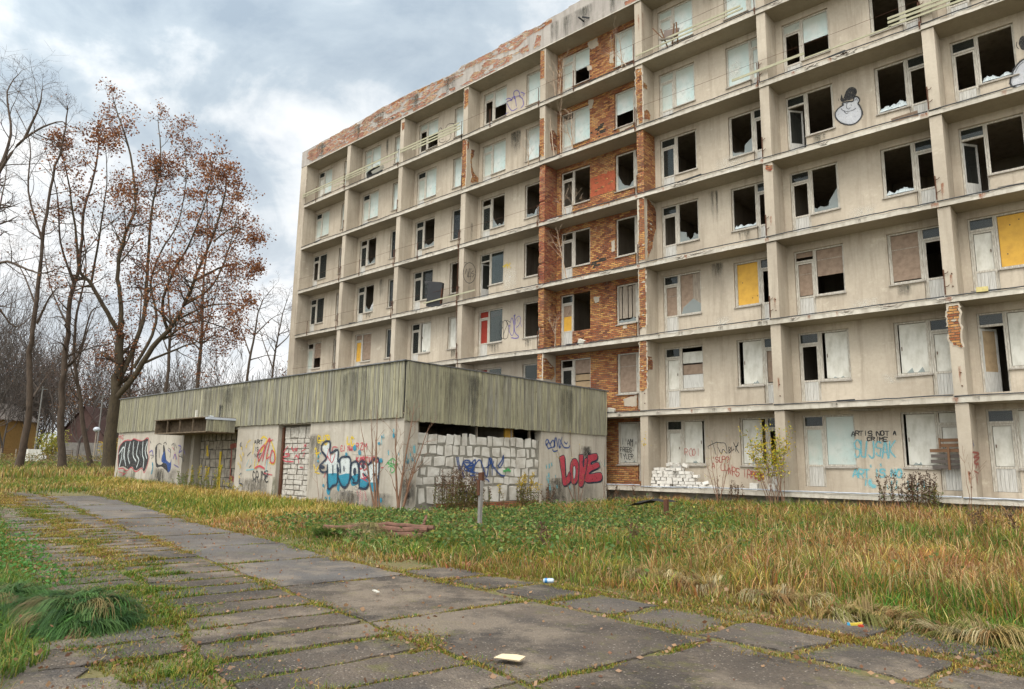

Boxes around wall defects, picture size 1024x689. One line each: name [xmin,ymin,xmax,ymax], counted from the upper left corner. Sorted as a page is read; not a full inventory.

peeling [301,18,553,196]
peeling [634,67,654,125]
peeling [539,117,564,158]
peeling [590,170,616,197]
peeling [935,297,965,349]